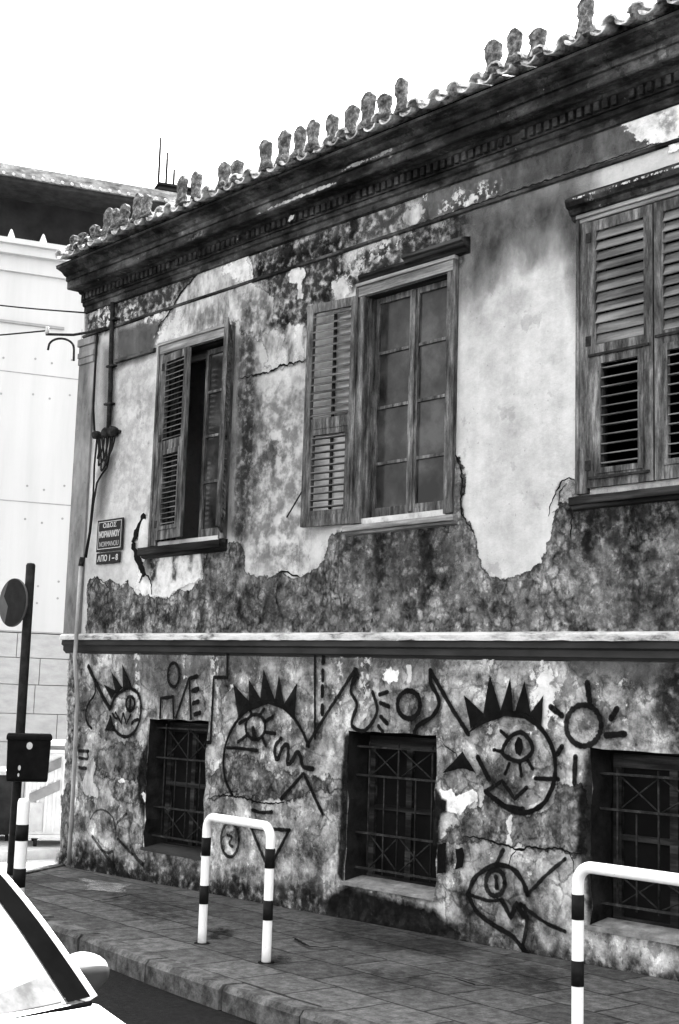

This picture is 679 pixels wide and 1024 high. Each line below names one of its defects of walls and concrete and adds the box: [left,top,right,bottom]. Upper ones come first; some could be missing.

peeling [622,105,679,153]
leakage [85,275,197,367]
crack [240,360,306,379]
leakage [234,330,277,549]
spalling [85,456,679,633]
crack [209,794,290,805]
peeling [433,751,596,926]
crack [464,836,581,872]